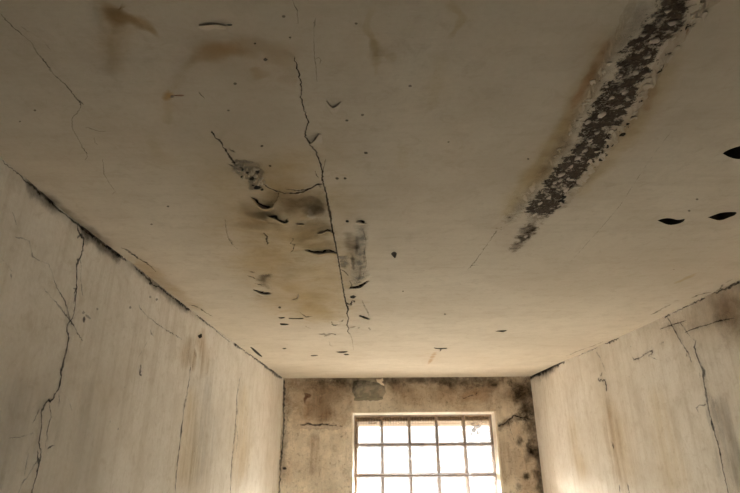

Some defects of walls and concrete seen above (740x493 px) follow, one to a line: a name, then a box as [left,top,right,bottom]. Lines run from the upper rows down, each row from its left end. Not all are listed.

crack [207,130,243,167]
crack [261,54,359,350]
spalling [491,0,721,230]
crack [33,227,84,486]
leakage [410,377,481,386]
crack [491,412,530,441]
leakage [515,361,565,493]
crack [653,309,729,491]